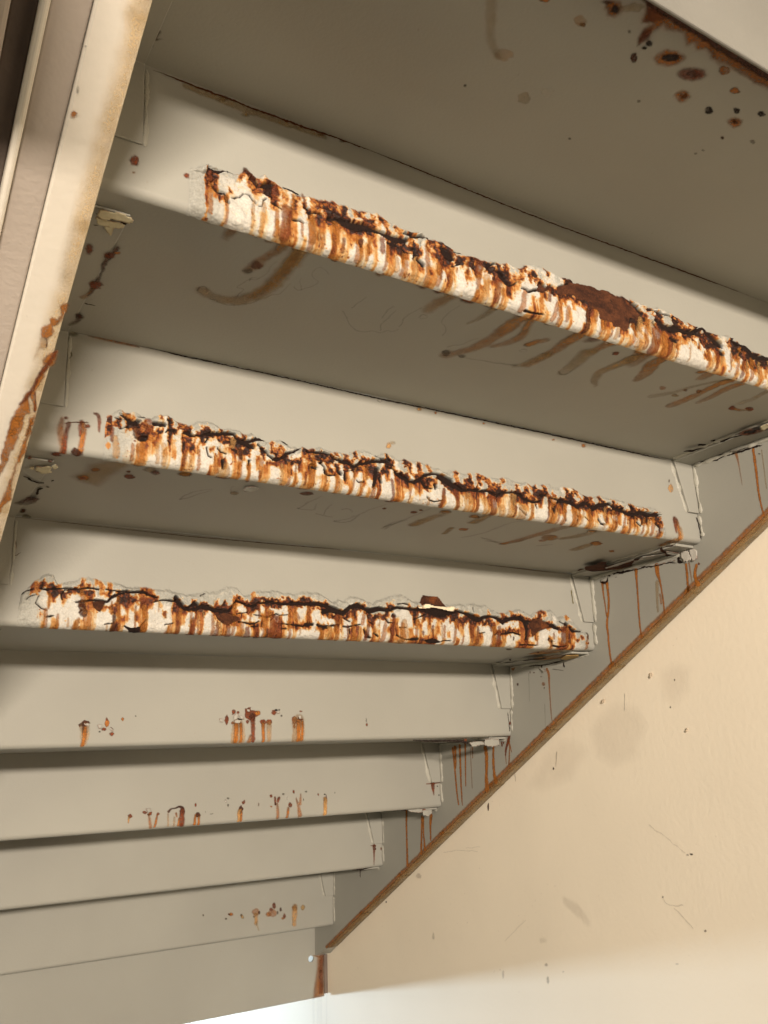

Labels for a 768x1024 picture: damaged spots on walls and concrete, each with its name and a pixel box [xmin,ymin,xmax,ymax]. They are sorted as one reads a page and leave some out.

rust [628,0,768,102]
peeling [95,209,134,236]
peeling [186,164,768,390]
rust [0,303,68,512]
rust [52,413,101,456]
crack [70,245,673,492]
rust [445,316,666,379]
peeling [102,409,697,583]
peeling [16,573,589,688]
rust [219,707,304,743]
rust [314,448,768,996]
rust [128,803,201,829]